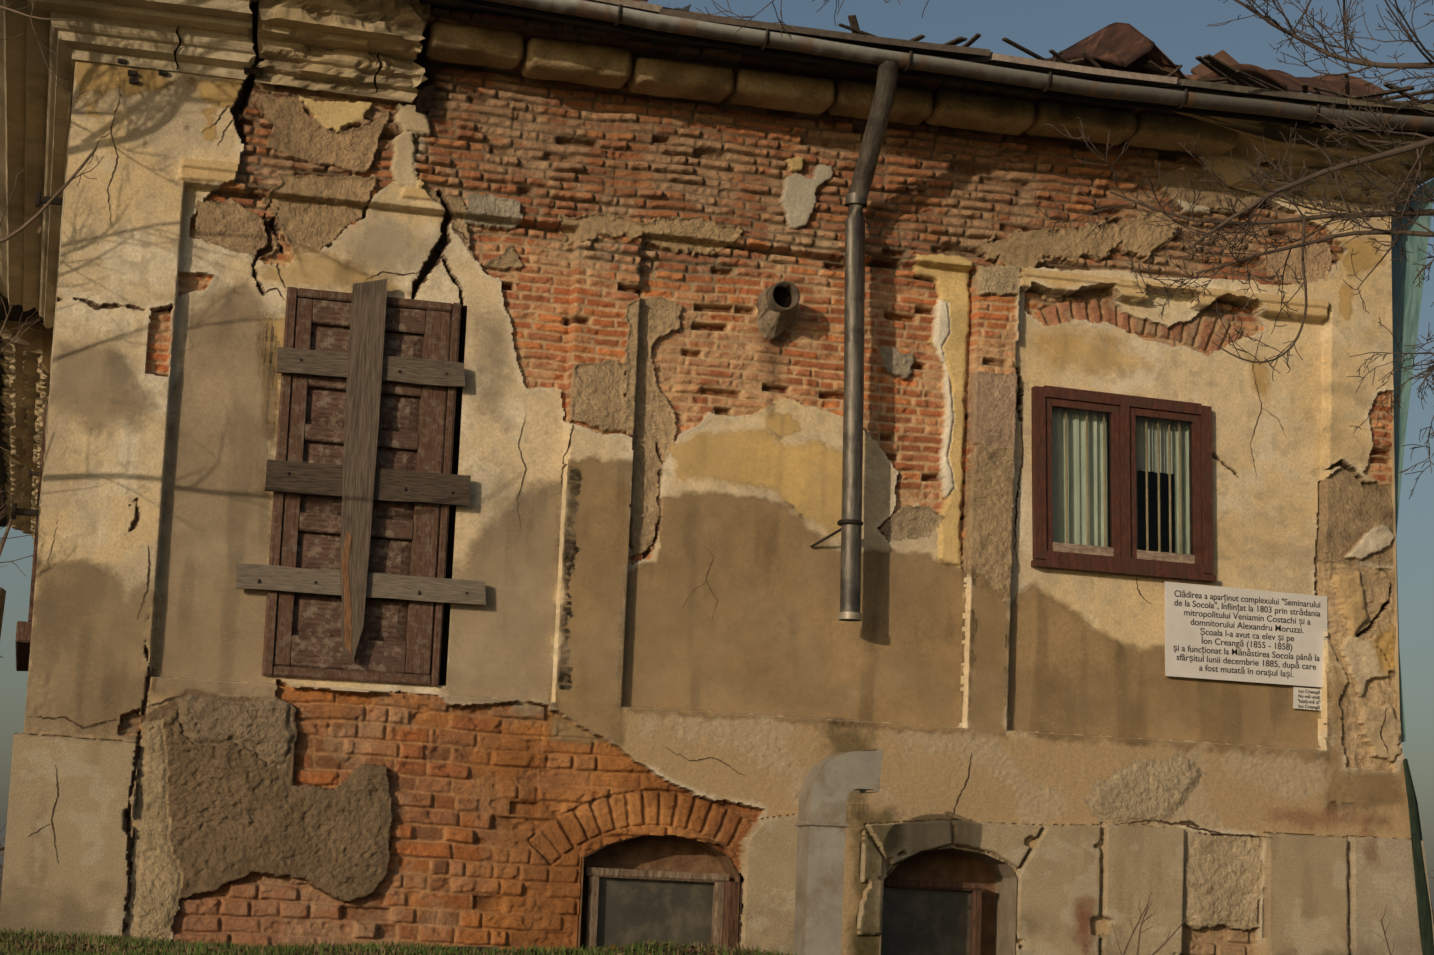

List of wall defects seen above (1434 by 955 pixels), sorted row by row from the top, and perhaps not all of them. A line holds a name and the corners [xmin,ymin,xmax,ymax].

crack [201,1,264,145]
crack [251,198,286,300]
crack [366,190,473,306]
flaking render [76,7,1382,601]
crack [28,497,186,938]
flaking render [171,679,766,951]
flaking render [1314,390,1404,773]